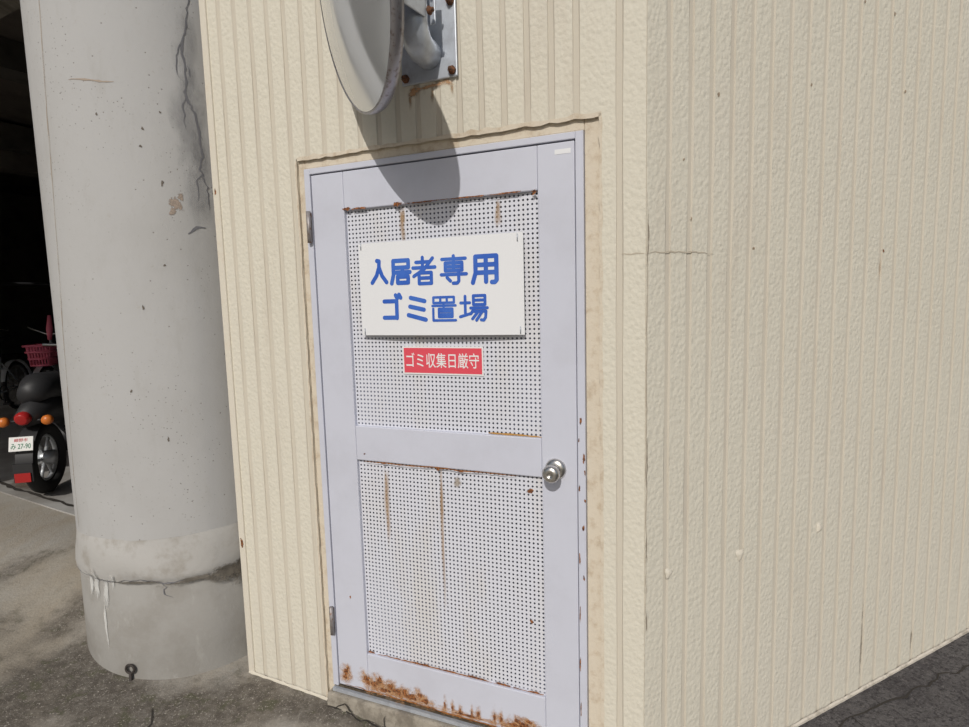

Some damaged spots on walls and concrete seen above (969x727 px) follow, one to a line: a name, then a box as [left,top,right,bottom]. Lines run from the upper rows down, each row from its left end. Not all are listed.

crack [175,0,210,210]
spalling [169,193,183,215]
rust [393,191,519,233]
crack [76,566,183,597]
damp [176,558,242,584]
damp [90,574,157,644]
rust [369,651,543,695]
rust [342,665,534,727]